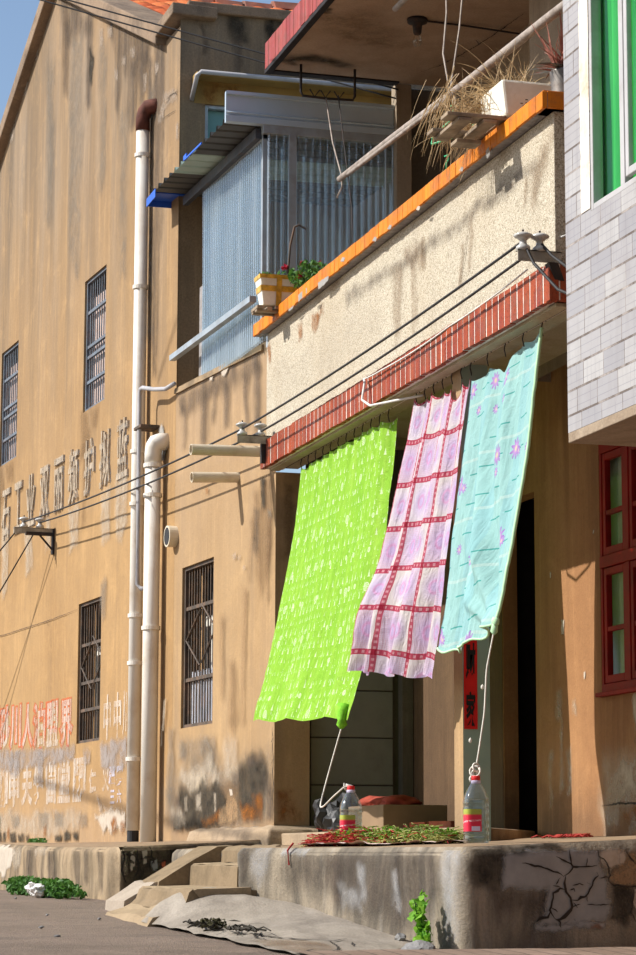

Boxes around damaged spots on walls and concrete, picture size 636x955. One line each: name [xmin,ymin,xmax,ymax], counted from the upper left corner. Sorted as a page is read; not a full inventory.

damp [65,1,94,120]
damp [110,22,164,187]
peeling [0,798,125,833]
spalling [219,789,237,823]
spalling [121,848,176,888]
crack [525,850,636,927]